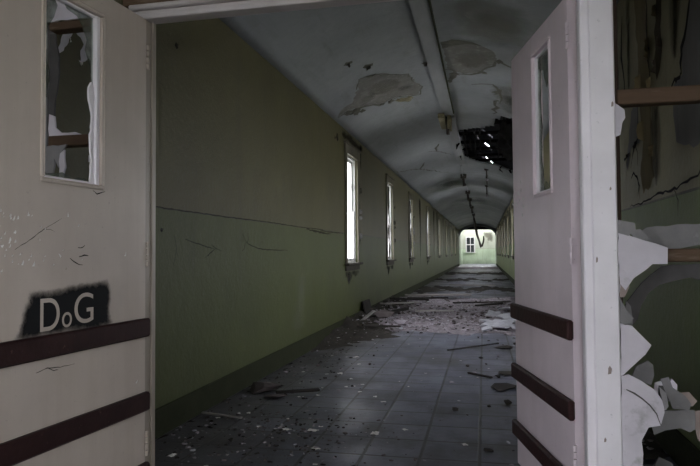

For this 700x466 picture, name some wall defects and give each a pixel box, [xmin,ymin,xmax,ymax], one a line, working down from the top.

peeling [440,39,511,83]
peeling [337,63,423,118]
crack [623,108,700,207]
crack [156,206,343,251]